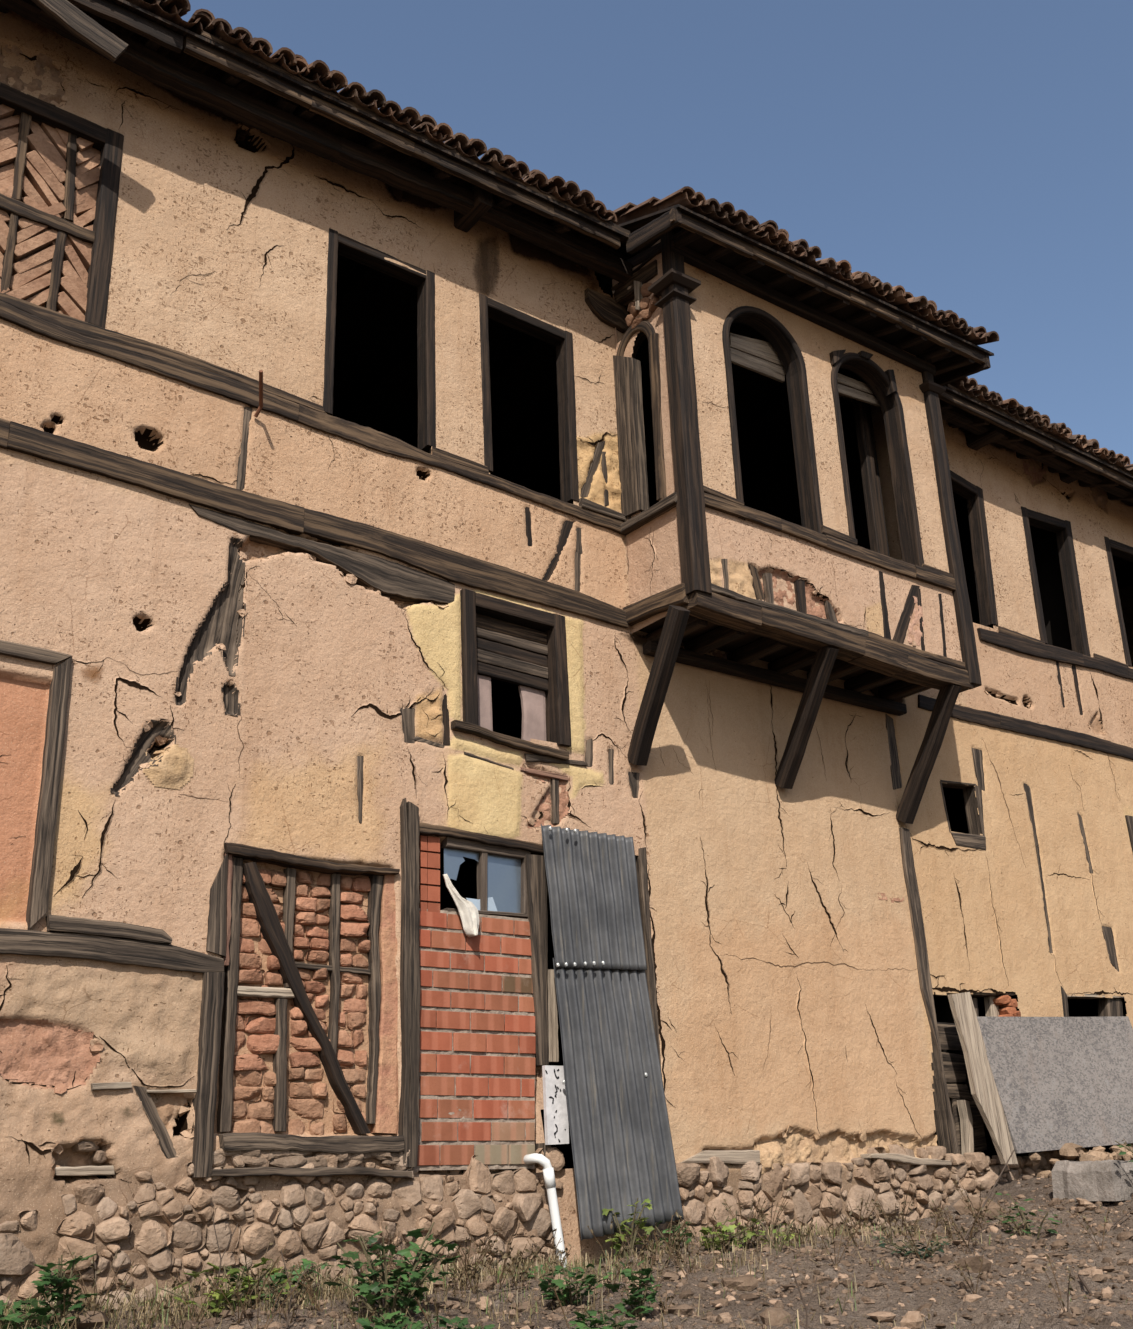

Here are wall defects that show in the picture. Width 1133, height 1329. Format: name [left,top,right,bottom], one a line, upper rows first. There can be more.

crack [226,145,423,231]
spalling [173,531,351,716]
spalling [339,571,449,609]
spalling [748,563,840,623]
crack [54,556,295,899]
spalling [522,763,570,828]
crack [524,781,602,828]
crack [593,635,716,798]
crack [984,673,1121,924]
crack [637,791,685,1108]
crack [700,673,1019,1143]
spalling [0,1019,104,1094]